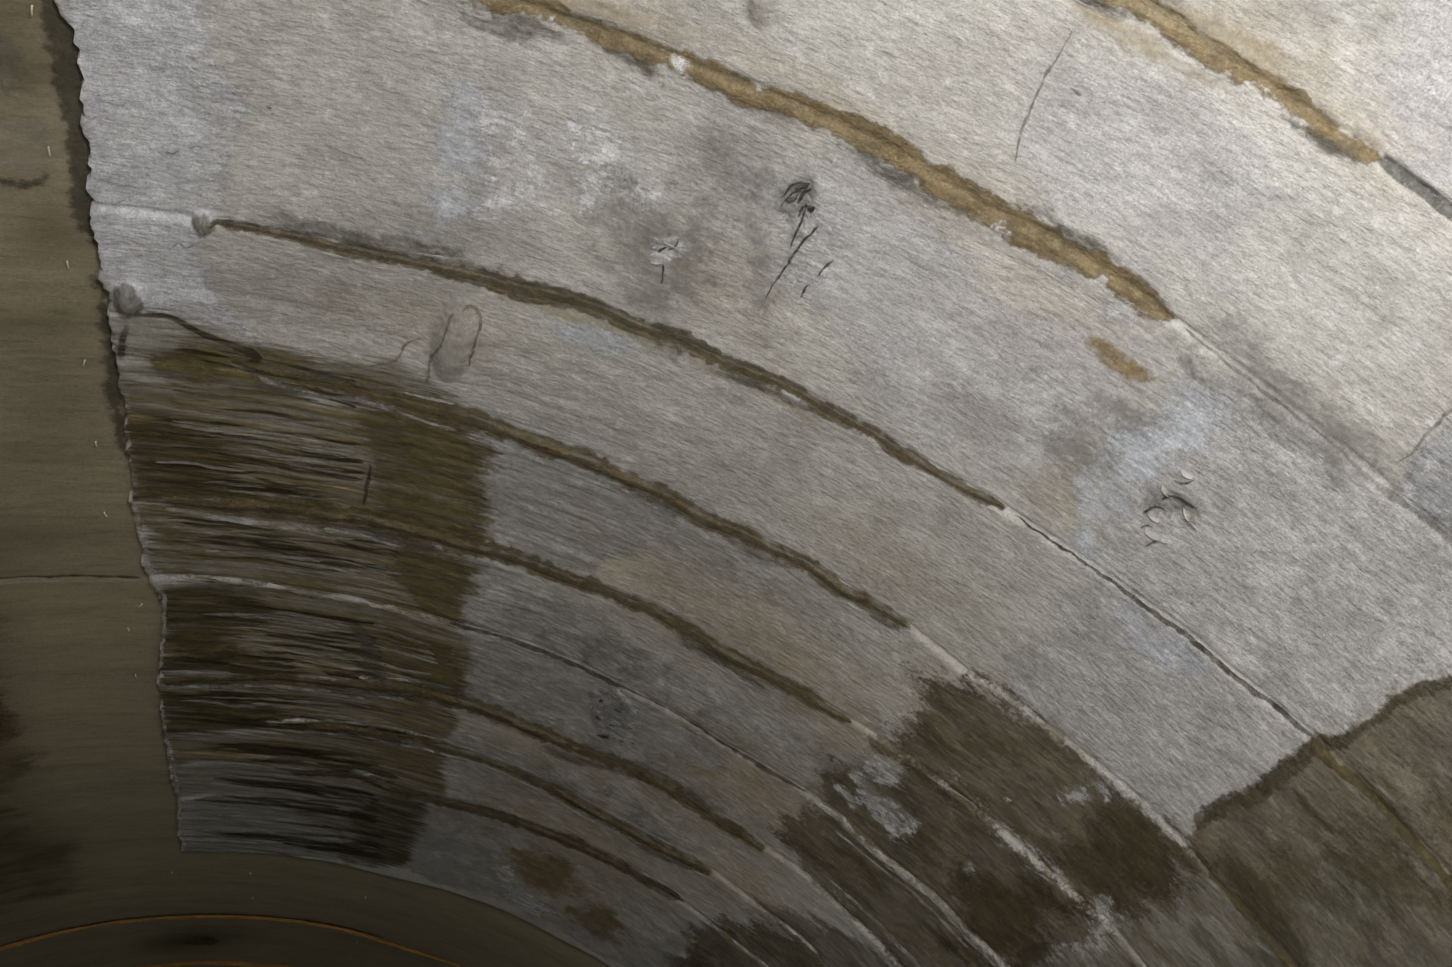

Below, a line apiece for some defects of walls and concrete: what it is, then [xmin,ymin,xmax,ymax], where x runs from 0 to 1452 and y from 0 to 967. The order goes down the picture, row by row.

leakage [41,0,361,450]
crack [318,304,482,381]
leakage [416,77,662,236]
corrosion [420,0,1177,327]
crack [767,189,833,298]
leakage [1028,52,1287,273]
corrosion [1075,0,1452,220]
crack [1187,329,1452,541]
leakage [134,409,438,861]
crack [450,622,807,792]
leakage [408,154,1452,967]
crack [1018,516,1452,891]